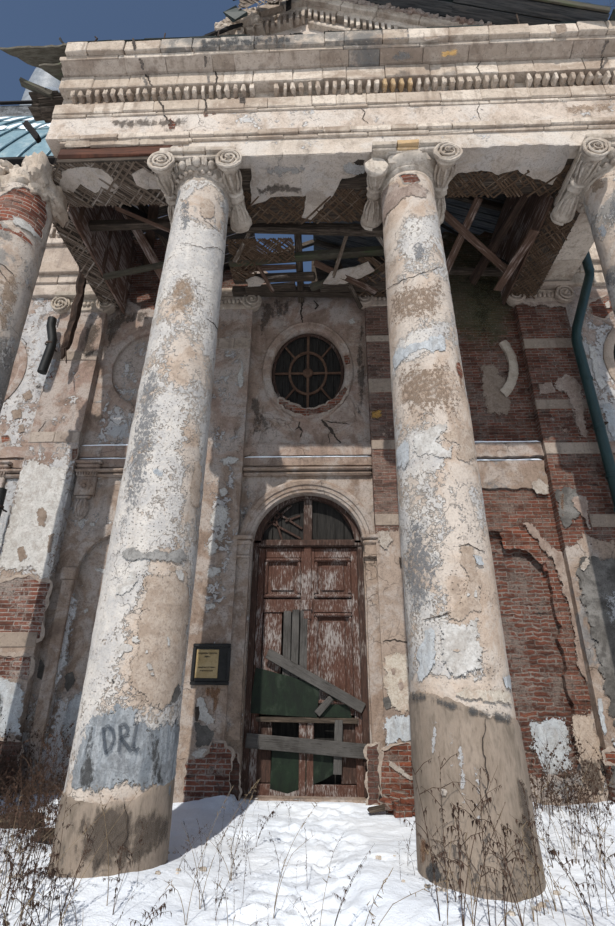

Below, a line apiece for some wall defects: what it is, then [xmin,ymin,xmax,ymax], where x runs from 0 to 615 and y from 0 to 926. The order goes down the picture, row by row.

crack [132,38,172,124]
flaking render [0,186,48,246]
flaking render [587,294,613,320]
crack [295,419,347,443]
peeling [392,334,460,417]
peeling [396,424,477,469]
peeling [480,363,511,415]
peeling [539,374,588,438]
peeling [601,403,615,441]
peeling [0,458,69,643]
peeling [61,547,242,803]
peeling [0,652,45,795]